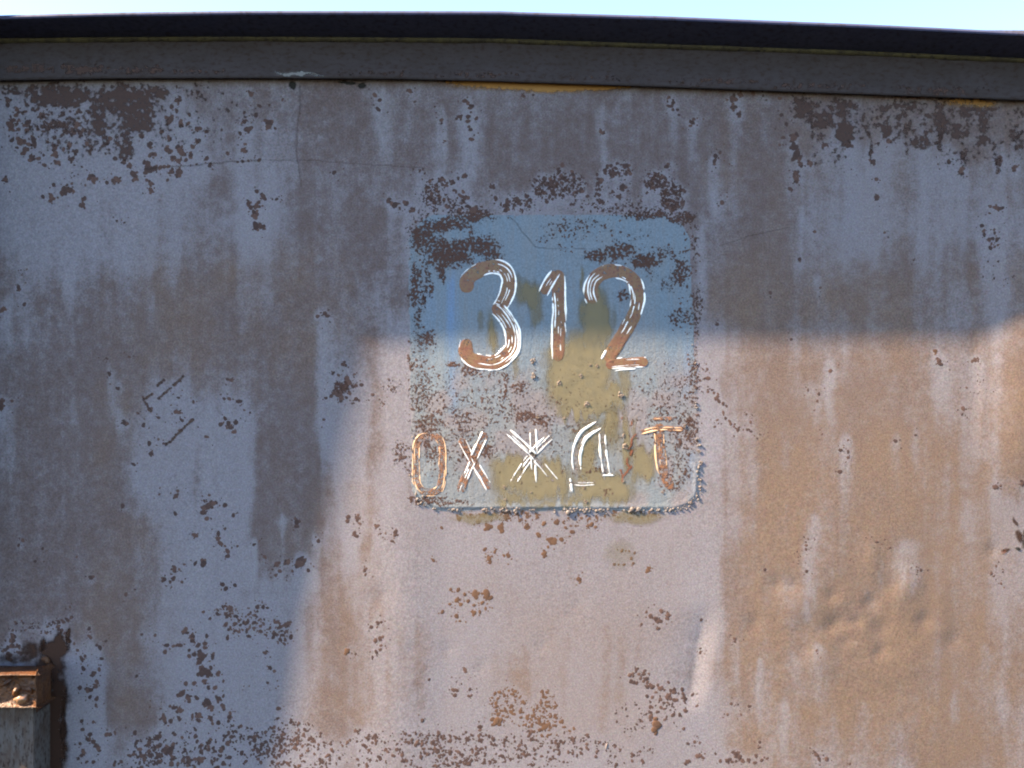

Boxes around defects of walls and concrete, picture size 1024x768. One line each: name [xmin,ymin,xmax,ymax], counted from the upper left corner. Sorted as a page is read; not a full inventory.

peeling [142,157,183,194]
leakage [489,318,497,351]
peeling [380,208,705,508]
leakage [493,282,654,512]